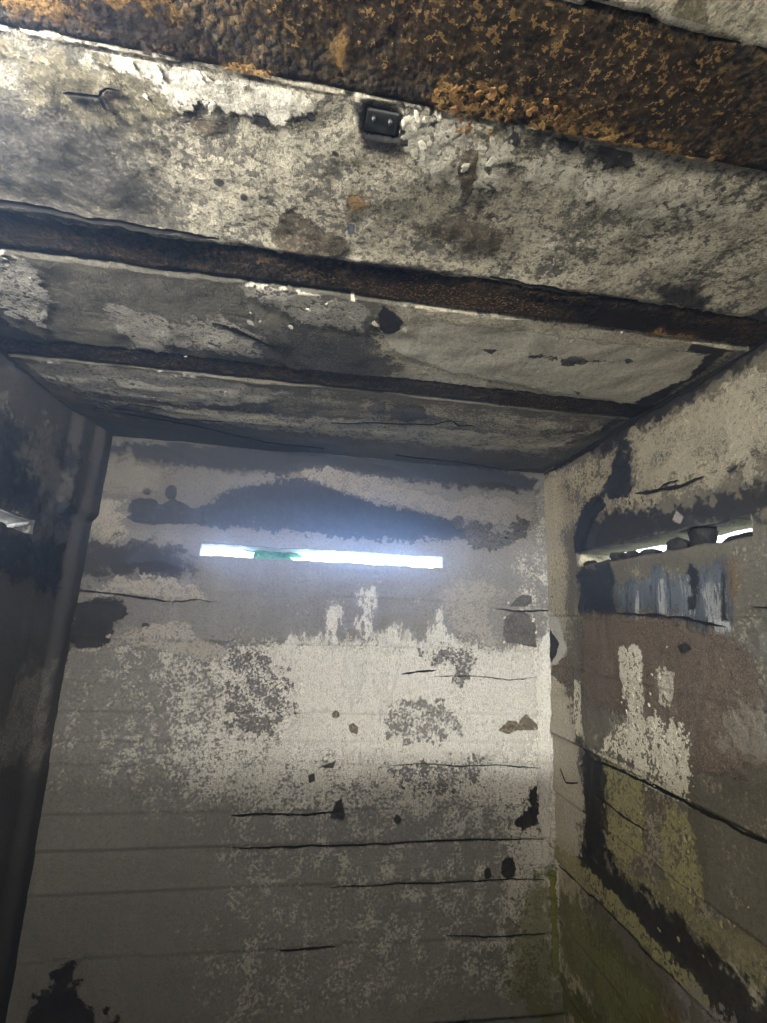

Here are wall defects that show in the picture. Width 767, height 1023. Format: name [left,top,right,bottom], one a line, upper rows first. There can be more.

corrosion [0,0,181,33]
corrosion [236,0,760,156]
peeling [398,69,763,255]
peeling [269,208,354,259]
peeling [0,248,60,329]
peeling [93,279,407,359]
peeling [22,361,591,454]
water stain [66,596,128,661]
peeling [188,636,302,744]
peeling [378,697,491,796]
peeling [499,714,538,734]
peeling [549,550,767,853]